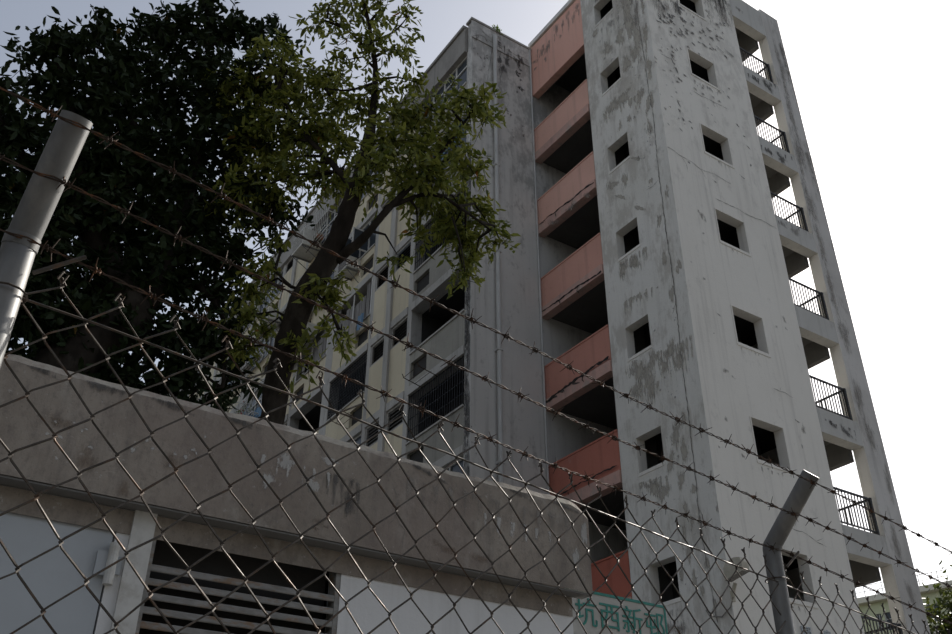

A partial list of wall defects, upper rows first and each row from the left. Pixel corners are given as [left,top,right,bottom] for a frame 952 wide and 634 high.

crack [636,4,771,623]